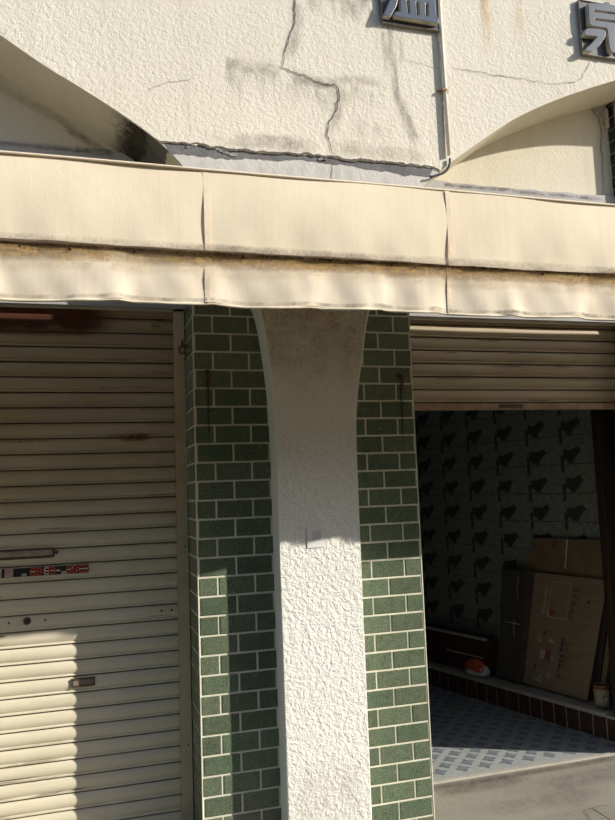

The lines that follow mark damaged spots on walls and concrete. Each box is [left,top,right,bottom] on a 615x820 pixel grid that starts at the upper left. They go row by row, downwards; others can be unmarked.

crack [161,0,438,177]
crack [407,60,591,94]
leakage [120,121,168,165]